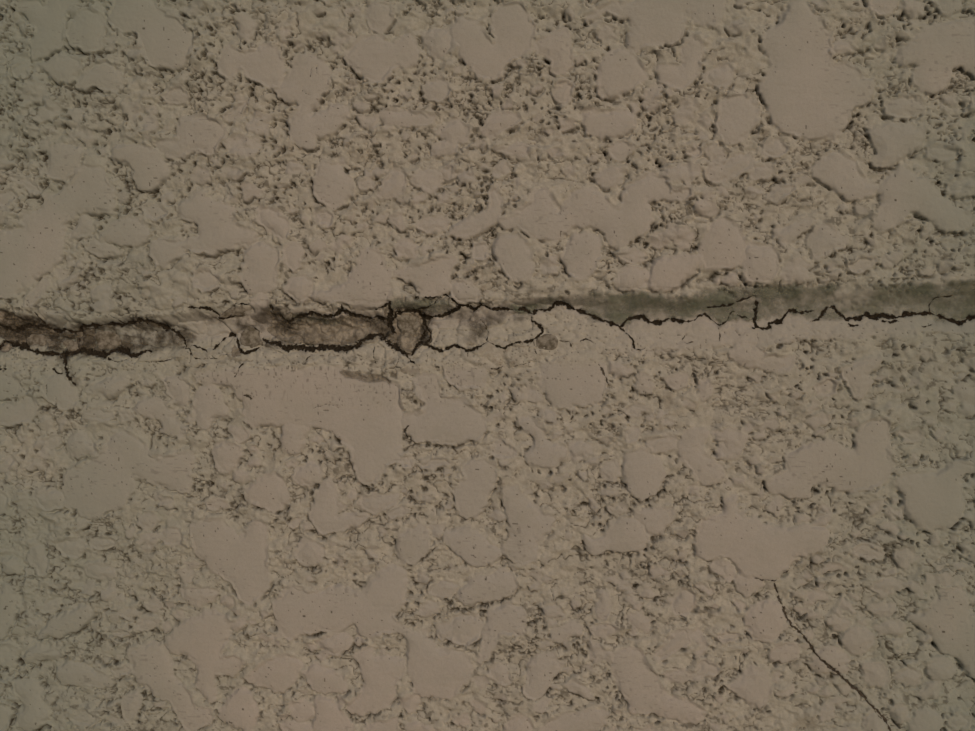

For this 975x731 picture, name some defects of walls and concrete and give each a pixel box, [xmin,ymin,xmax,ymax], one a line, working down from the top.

spalling [0,310,122,352]
peeling [219,305,251,318]
spalling [268,306,432,356]
crack [0,294,975,400]
crack [755,568,891,731]